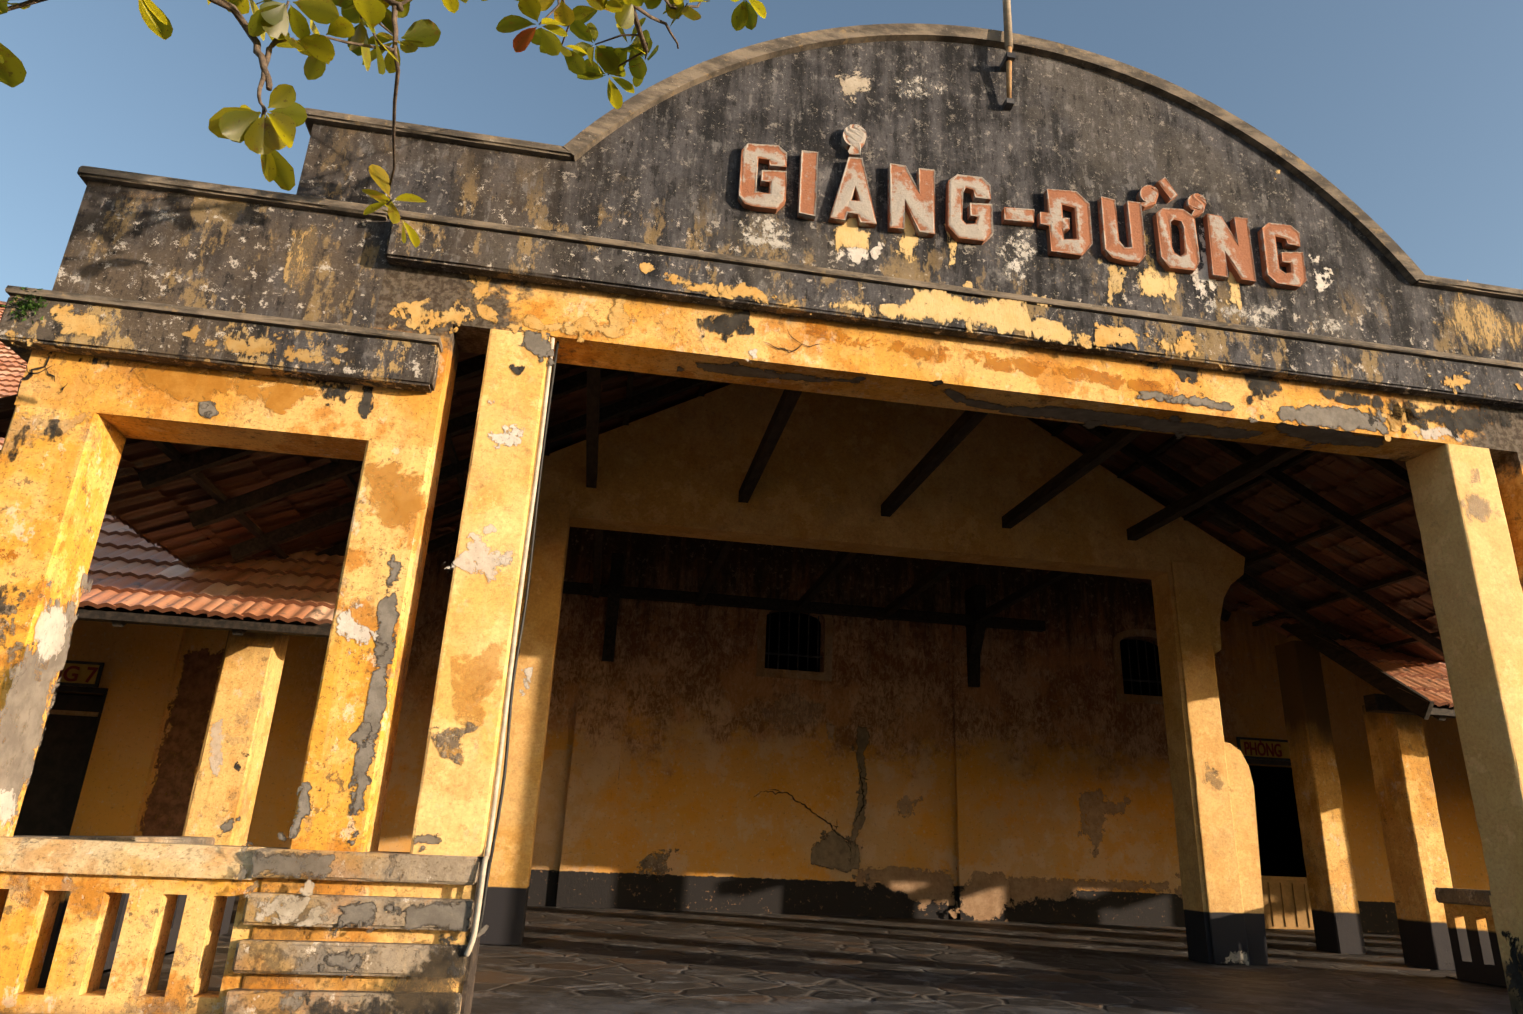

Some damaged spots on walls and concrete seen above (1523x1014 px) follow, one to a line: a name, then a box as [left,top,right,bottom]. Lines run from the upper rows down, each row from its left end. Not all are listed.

damp [835,242,885,264]
damp [1098,223,1279,328]
damp [698,309,757,343]
peeling [829,281,1226,371]
damp [1320,387,1523,443]
peeling [444,524,513,583]
peeling [0,573,93,825]
peeling [217,554,403,892]
spalling [430,722,478,765]
crack [754,726,870,879]
peeling [811,829,1183,922]
peeling [319,900,489,982]